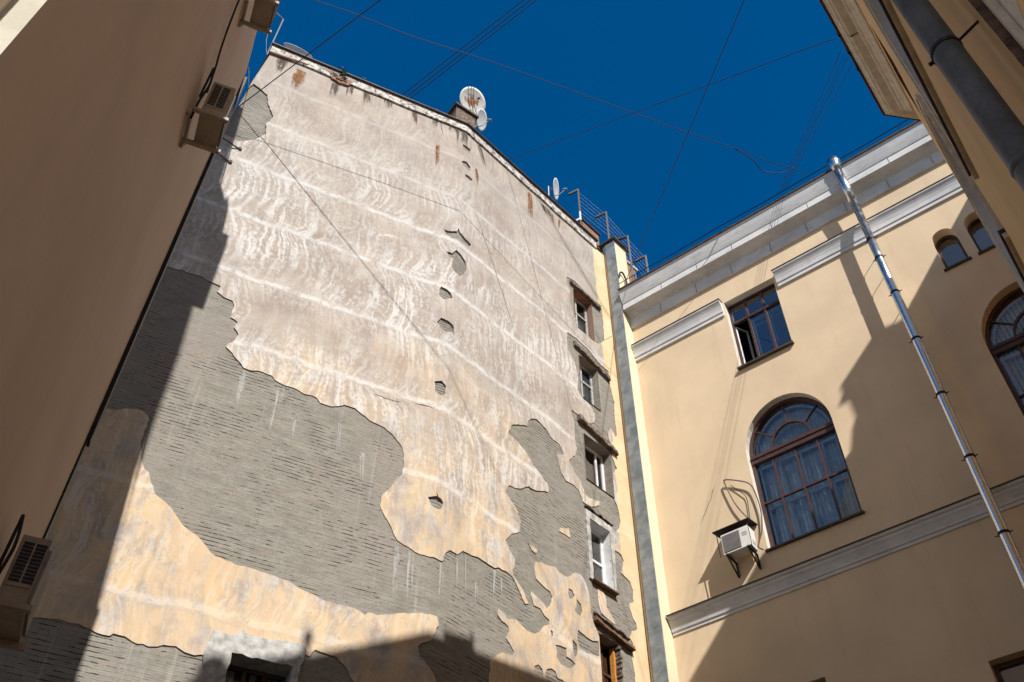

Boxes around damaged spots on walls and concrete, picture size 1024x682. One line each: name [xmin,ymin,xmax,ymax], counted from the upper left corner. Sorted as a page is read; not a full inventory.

spalling [225,84,273,141]
spalling [106,266,637,682]
spalling [0,617,203,682]